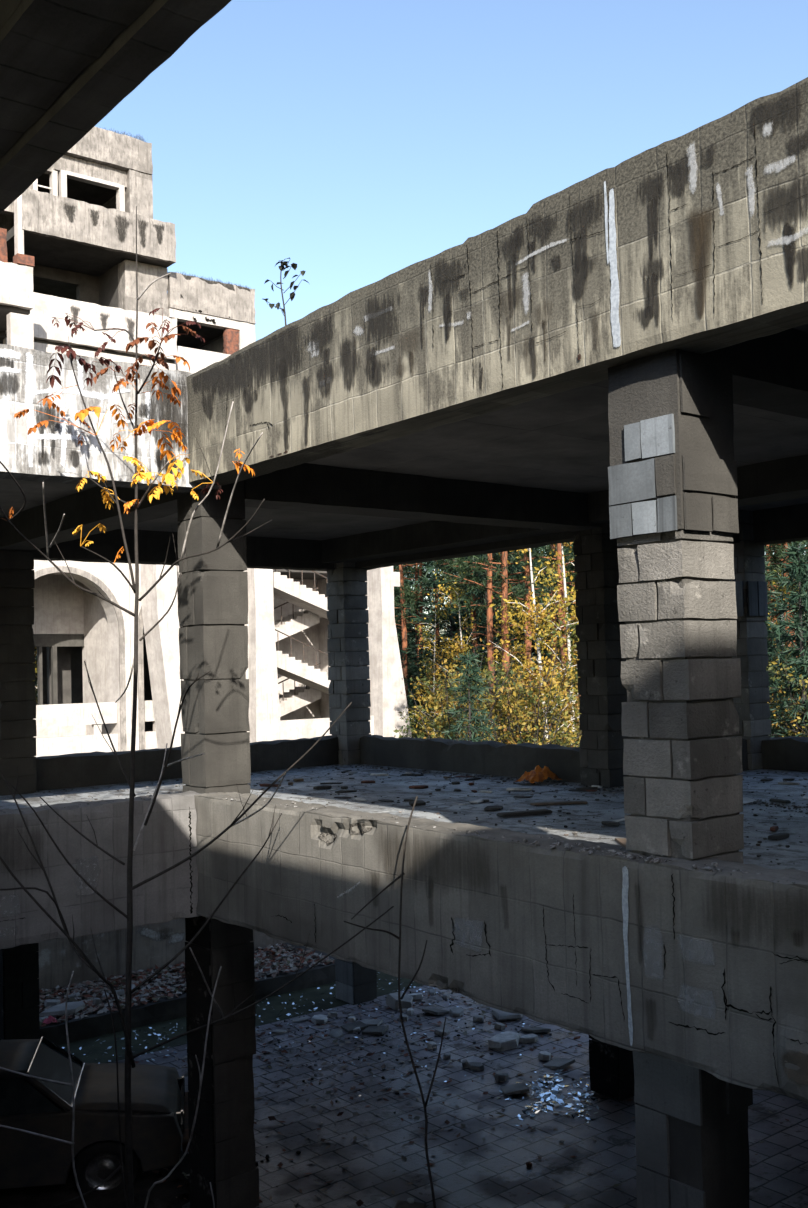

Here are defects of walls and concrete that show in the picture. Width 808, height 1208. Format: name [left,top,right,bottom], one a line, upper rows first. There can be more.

leakage [65,203,76,222]
leakage [116,216,165,247]
leakage [418,257,470,348]
leakage [500,193,602,379]
leakage [633,144,714,330]
leakage [747,83,808,288]
leakage [0,294,400,475]
spalling [318,823,374,845]
crack [450,917,491,957]
crack [543,894,625,1019]
crack [663,874,675,970]
crack [669,953,808,1081]